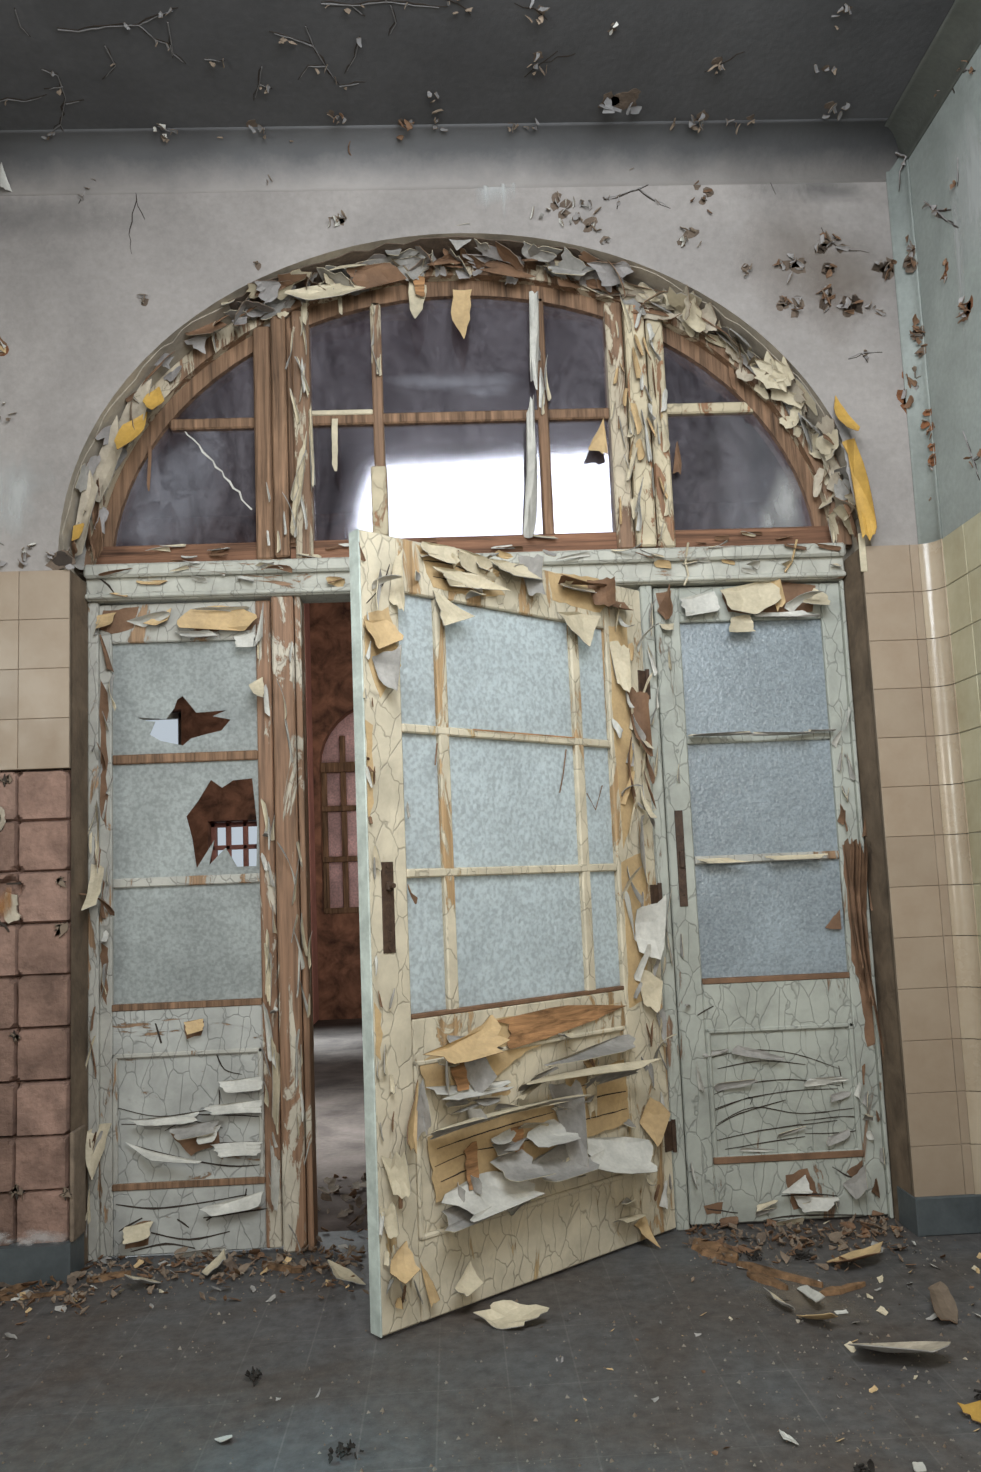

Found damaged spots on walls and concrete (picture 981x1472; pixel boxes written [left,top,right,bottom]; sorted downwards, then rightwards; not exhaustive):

peeling [514,0,550,25]
peeling [831,3,852,30]
peeling [524,51,574,77]
peeling [153,123,178,143]
peeling [427,91,448,132]
peeling [598,88,642,115]
peeling [670,110,755,135]
peeling [822,101,850,120]
peeling [772,227,918,318]
peeling [956,295,973,324]
peeling [896,314,936,470]
peeling [0,191,886,1309]